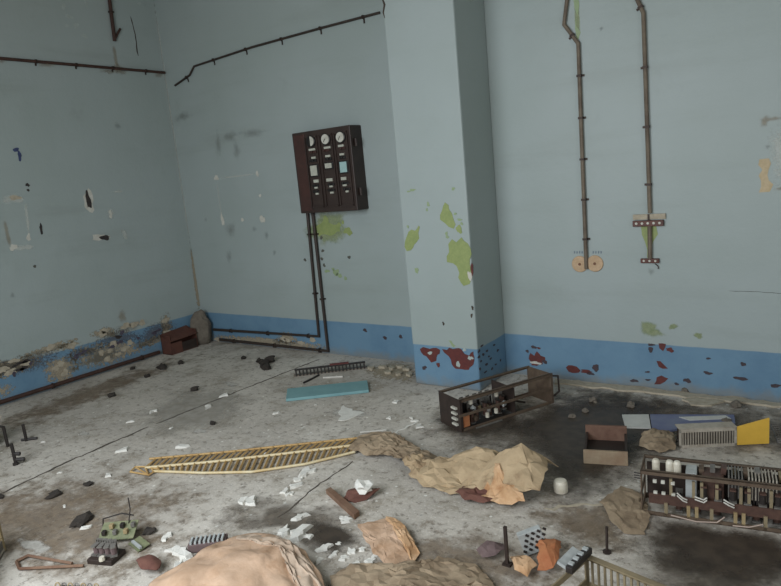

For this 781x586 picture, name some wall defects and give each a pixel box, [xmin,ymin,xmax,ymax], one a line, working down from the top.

peeling [0,315,172,400]
flaking render [366,340,501,382]
peeling [525,345,547,366]
peeling [648,343,674,353]
flaking render [555,361,781,451]